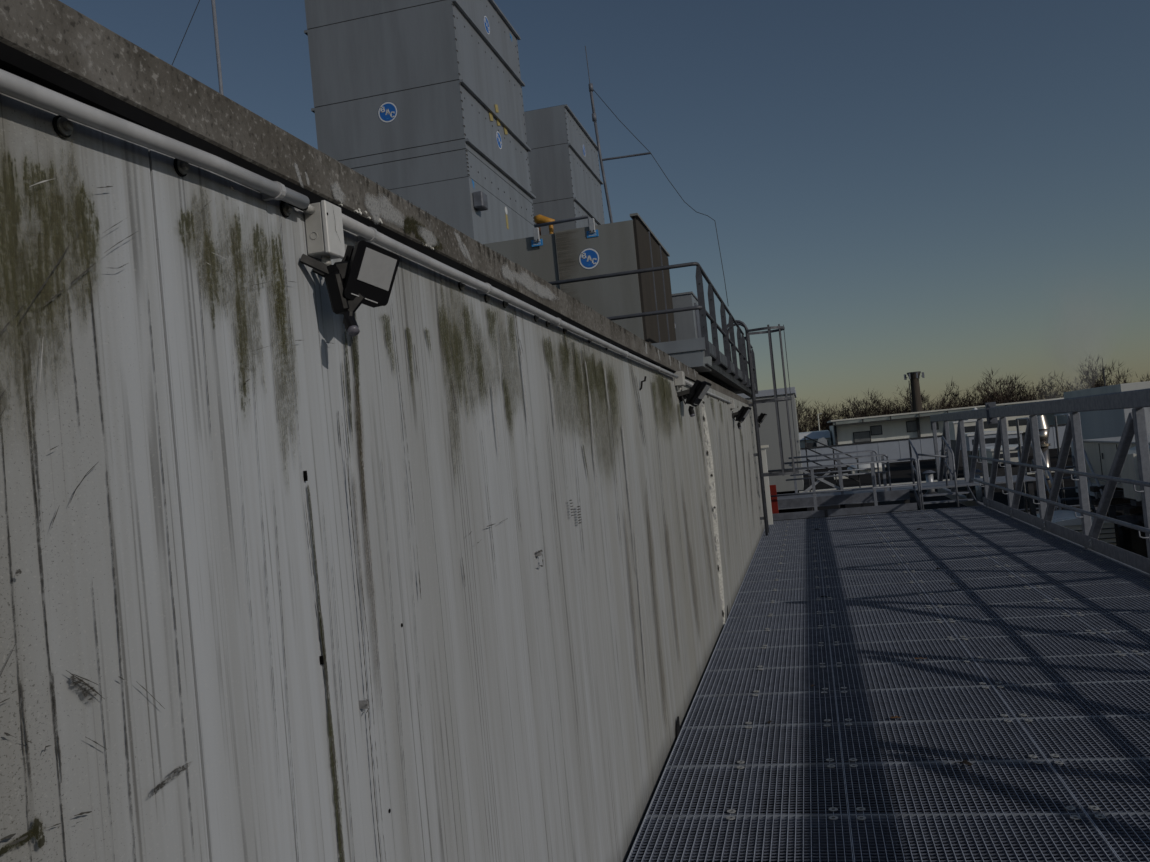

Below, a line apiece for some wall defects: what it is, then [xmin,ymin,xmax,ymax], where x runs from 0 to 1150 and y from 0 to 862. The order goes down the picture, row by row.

leakage [179,200,295,460]
leakage [383,305,529,459]
leakage [106,472,136,862]
leakage [167,526,181,695]